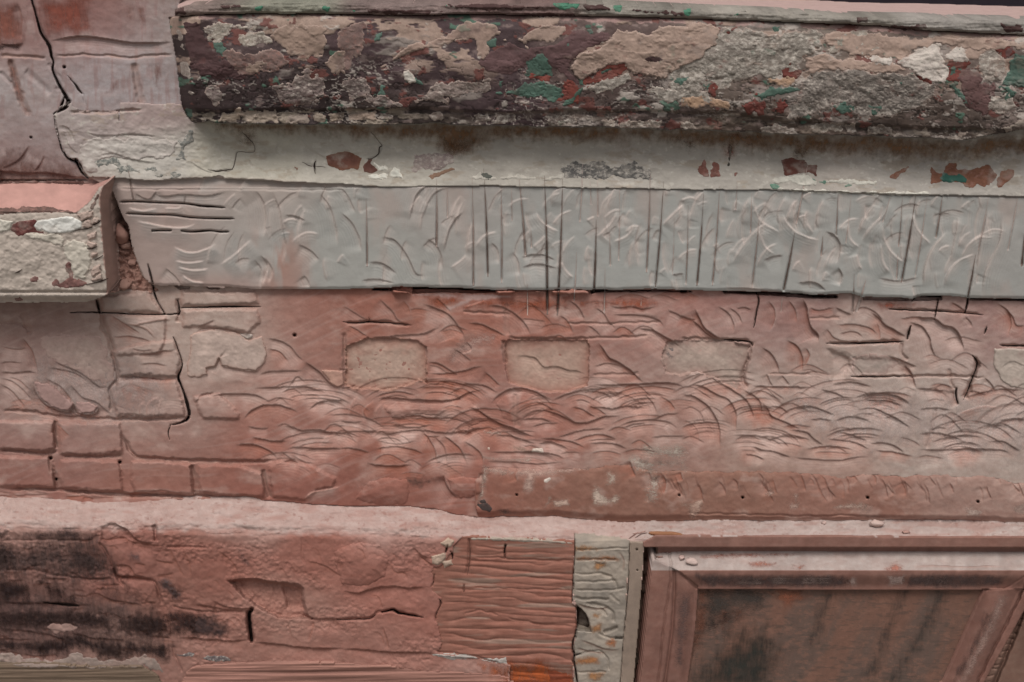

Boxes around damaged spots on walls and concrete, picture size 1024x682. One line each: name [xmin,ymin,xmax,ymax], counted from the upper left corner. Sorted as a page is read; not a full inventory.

crack [32,0,87,176]
peeling [177,10,577,126]
peeling [380,4,1024,137]
spalling [326,151,455,180]
spalling [773,157,1014,196]
peeling [26,194,103,282]
crack [70,211,252,440]
crack [827,296,1024,403]
crack [246,608,254,641]
crack [337,581,442,620]
spalling [577,606,589,627]